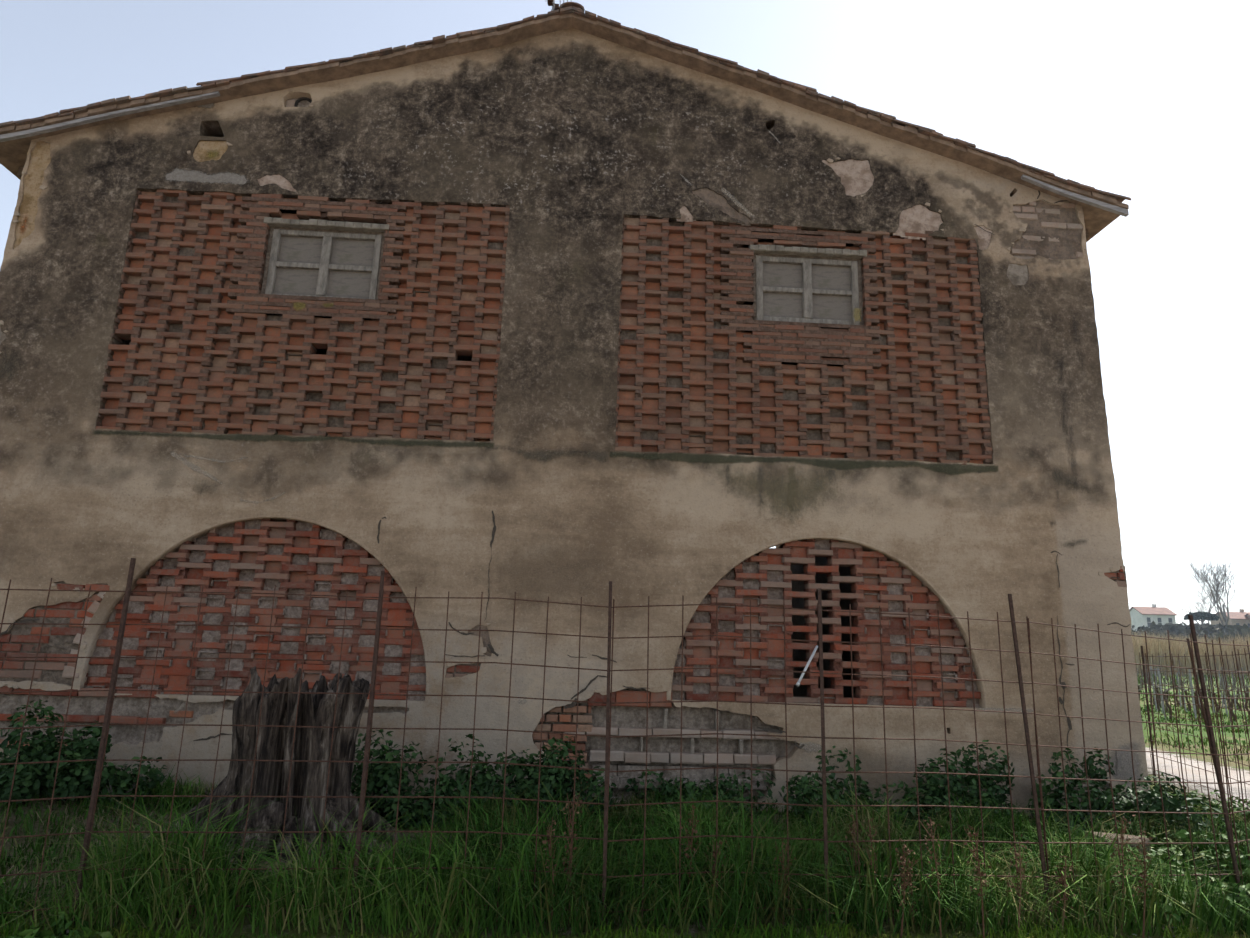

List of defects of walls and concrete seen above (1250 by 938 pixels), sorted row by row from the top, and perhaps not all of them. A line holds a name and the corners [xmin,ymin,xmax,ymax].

flaking render [187,141,233,162]
flaking render [257,174,296,192]
flaking render [822,157,874,197]
flaking render [893,202,944,240]
flaking render [1007,200,1087,285]
crack [445,511,498,658]
flaking render [0,581,235,750]
flaking render [445,623,492,678]
flaking render [532,688,797,807]